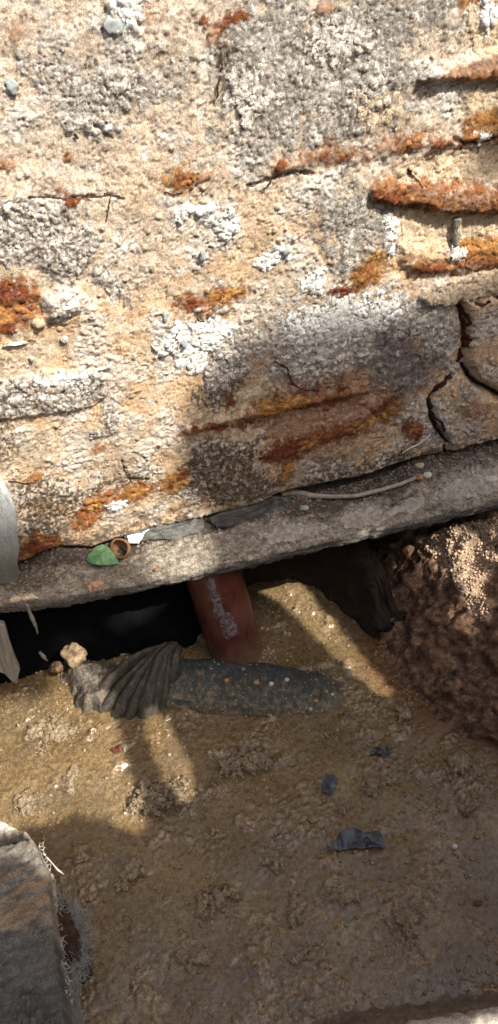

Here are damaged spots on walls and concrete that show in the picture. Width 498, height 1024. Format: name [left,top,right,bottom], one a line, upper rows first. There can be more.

corrosion [273,79,498,180]
corrosion [155,163,214,196]
corrosion [369,173,498,216]
corrosion [405,233,498,278]
corrosion [0,273,43,341]
corrosion [171,275,251,321]
crack [426,296,498,450]
corrosion [180,366,428,483]
corrosion [68,468,192,531]
corrosion [19,531,62,562]